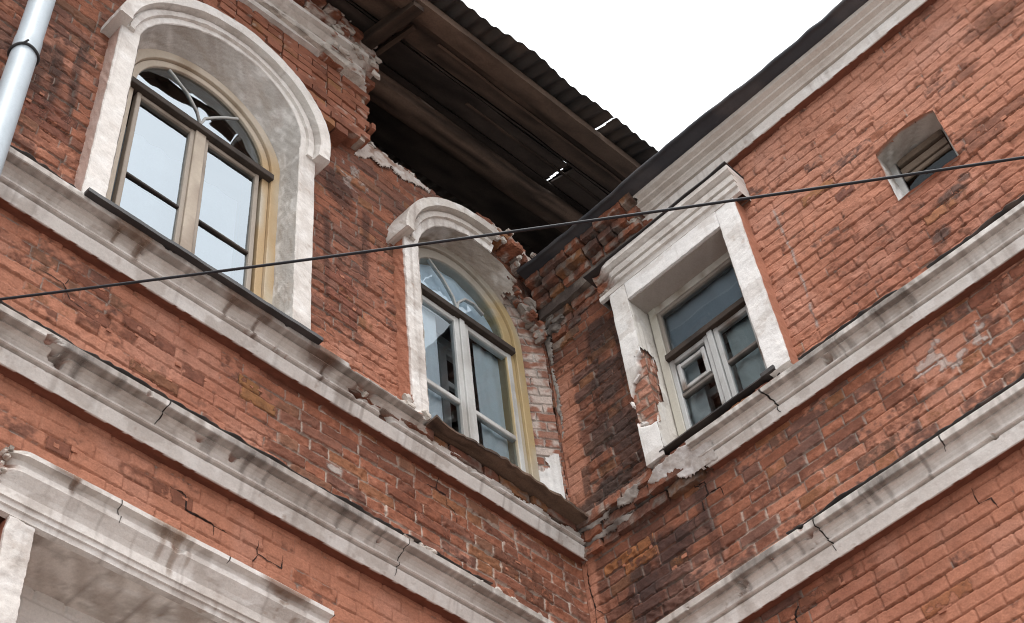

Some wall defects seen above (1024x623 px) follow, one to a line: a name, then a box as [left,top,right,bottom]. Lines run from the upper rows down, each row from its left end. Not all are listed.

peeling [330,21,382,80]
spalling [354,142,431,194]
spalling [500,252,569,501]
spalling [630,348,663,427]
spalling [348,386,718,564]
crack [170,486,225,535]
crack [227,544,283,569]